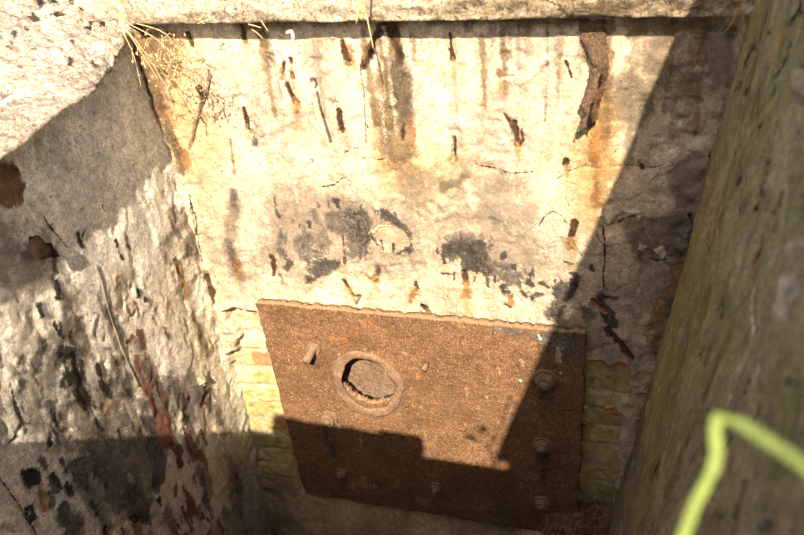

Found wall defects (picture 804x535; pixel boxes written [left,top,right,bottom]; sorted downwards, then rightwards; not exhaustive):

corrosion [133,24,211,175]
corrosion [375,21,416,166]
corrosion [503,113,524,151]
corrosion [589,97,619,210]
corrosion [173,256,188,299]
water stain [276,198,413,283]
water stain [436,231,597,325]
crack [596,226,606,289]
water stain [0,222,126,445]
water stain [20,466,50,523]
water stain [63,481,75,498]
water stain [139,414,167,485]